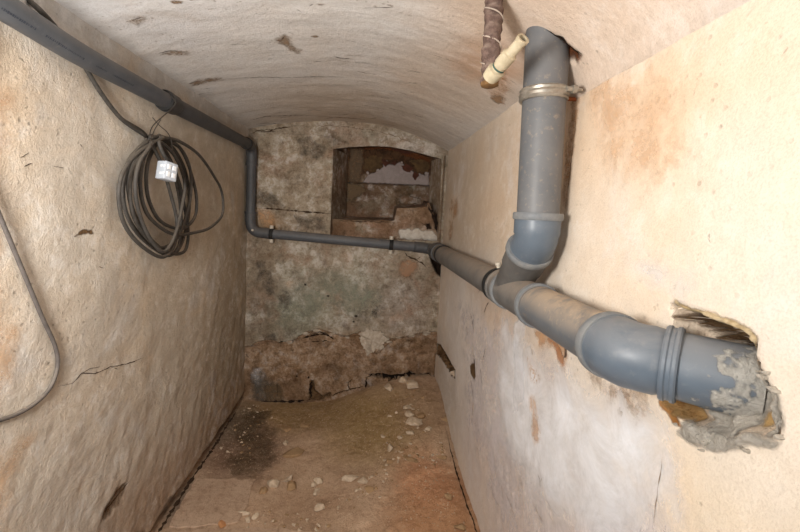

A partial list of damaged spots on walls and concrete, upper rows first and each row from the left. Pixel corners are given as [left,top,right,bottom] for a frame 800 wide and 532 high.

flaking render [346,147,434,186]
flaking render [399,223,437,241]
spalling [672,300,758,347]
crack [60,358,142,386]
flaking render [241,327,455,403]
spalling [659,358,785,454]